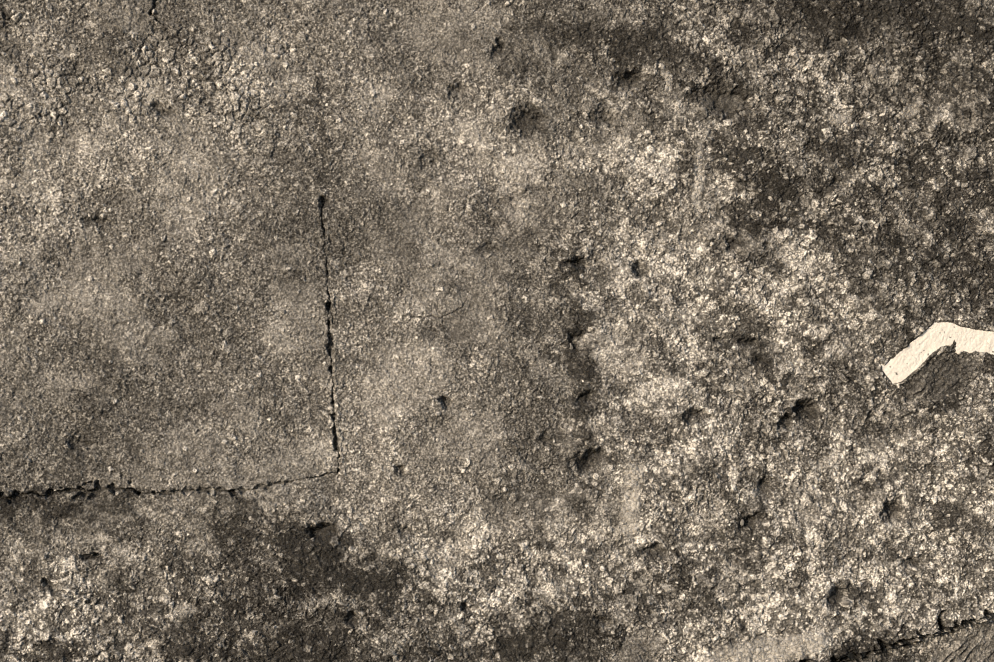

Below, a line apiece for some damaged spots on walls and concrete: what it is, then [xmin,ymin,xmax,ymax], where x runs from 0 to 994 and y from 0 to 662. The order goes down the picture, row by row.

crack [326,301,340,473]
crack [831,609,994,658]